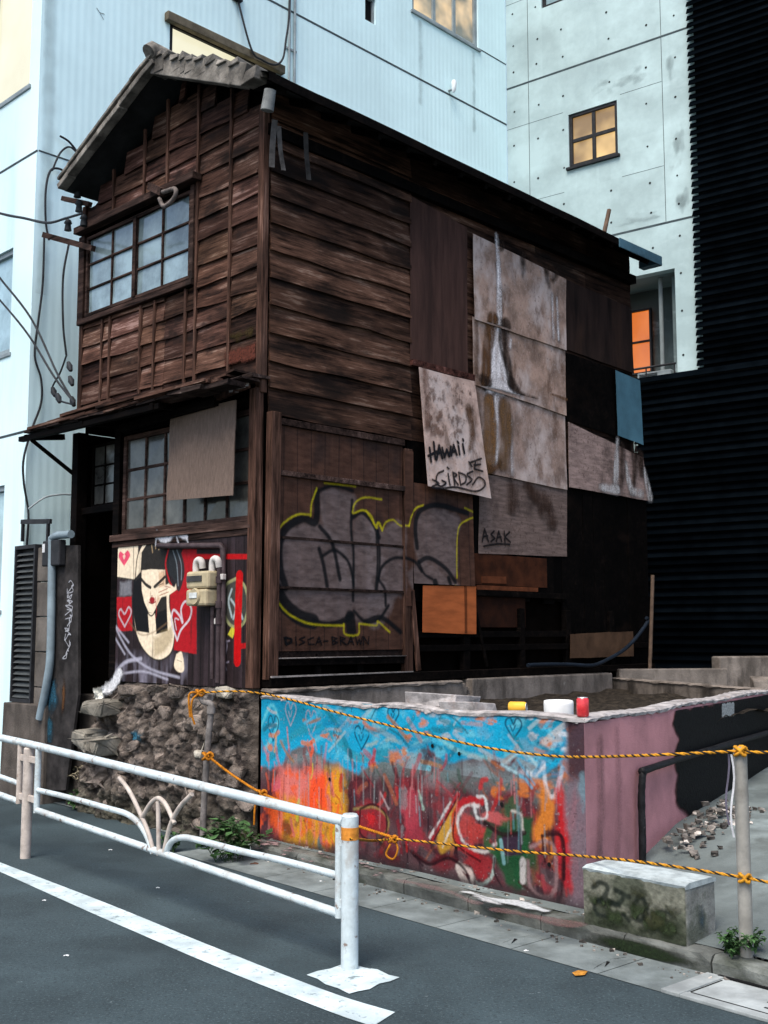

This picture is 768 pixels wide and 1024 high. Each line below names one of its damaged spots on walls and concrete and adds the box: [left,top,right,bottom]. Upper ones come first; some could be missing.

water stain [487,233,516,467]